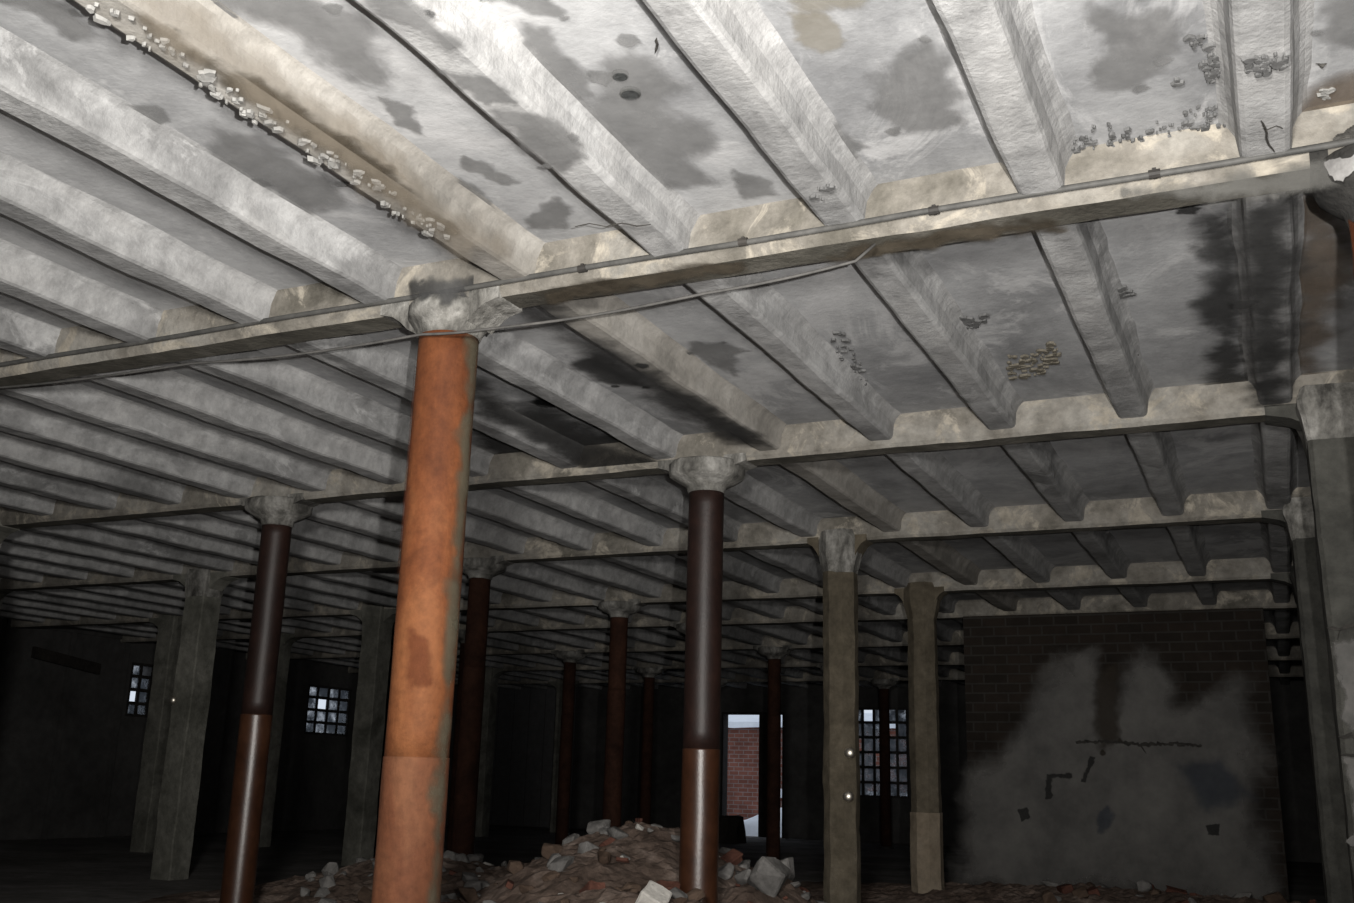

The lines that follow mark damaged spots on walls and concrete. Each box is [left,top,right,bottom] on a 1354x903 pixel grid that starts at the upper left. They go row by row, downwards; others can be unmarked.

damp [133,106,168,124]
damp [212,132,348,213]
damp [214,0,460,133]
damp [440,70,581,171]
damp [510,0,712,187]
damp [735,173,773,198]
damp [794,0,863,51]
damp [876,36,961,135]
damp [1090,10,1221,92]
peeling [1316,87,1336,100]
peeling [1324,155,1354,181]
spalling [1333,125,1354,141]